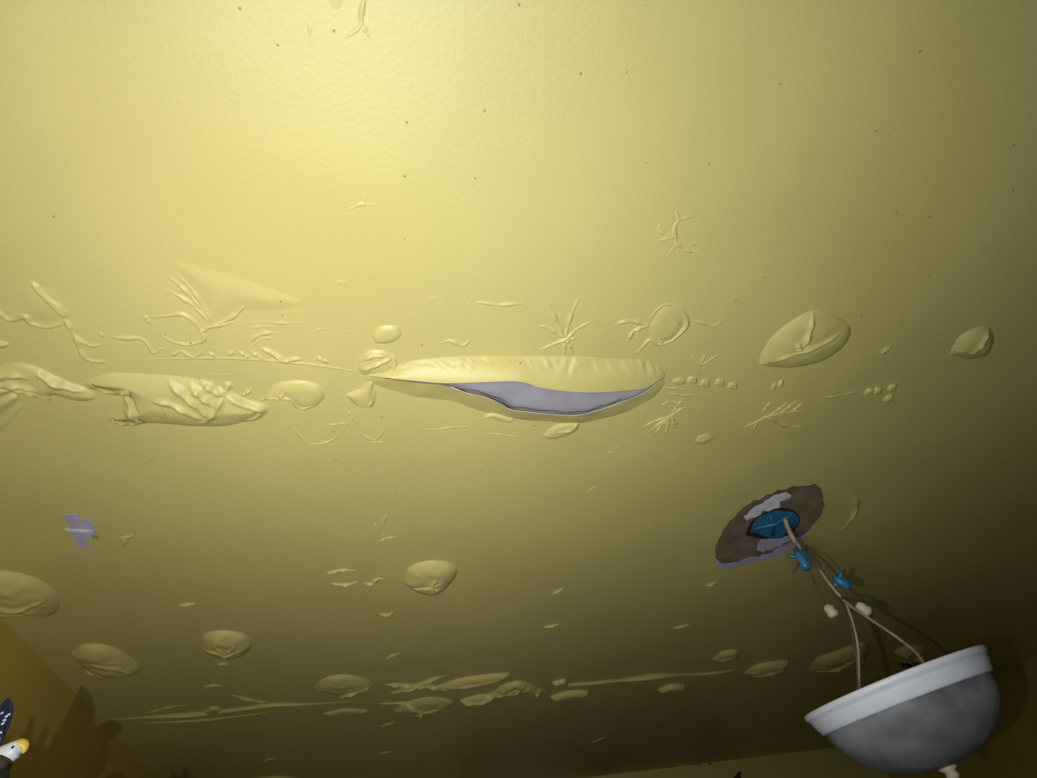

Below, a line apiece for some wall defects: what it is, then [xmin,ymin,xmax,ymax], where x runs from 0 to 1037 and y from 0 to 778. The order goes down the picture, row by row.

peeling [365,356,666,423]
peeling [63,514,98,549]